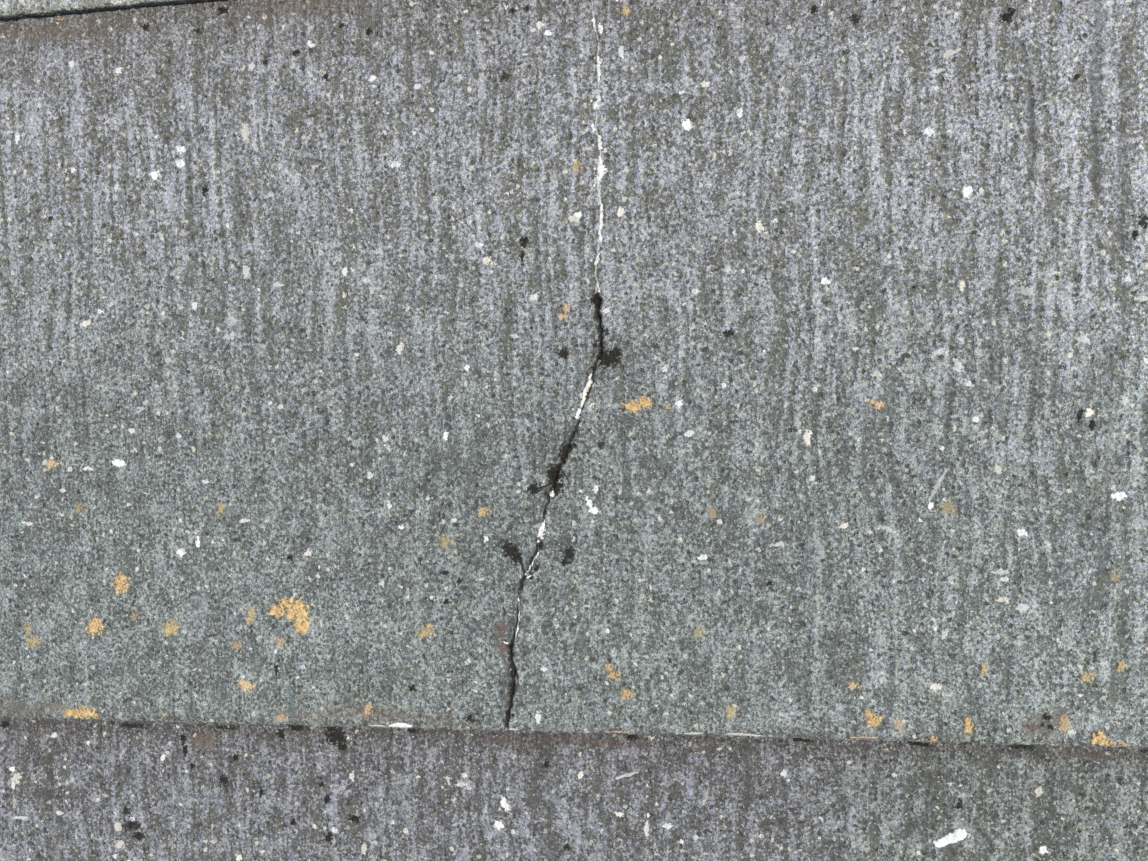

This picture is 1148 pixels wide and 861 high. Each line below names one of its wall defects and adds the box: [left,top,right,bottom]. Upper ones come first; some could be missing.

crack [501,2,626,726]